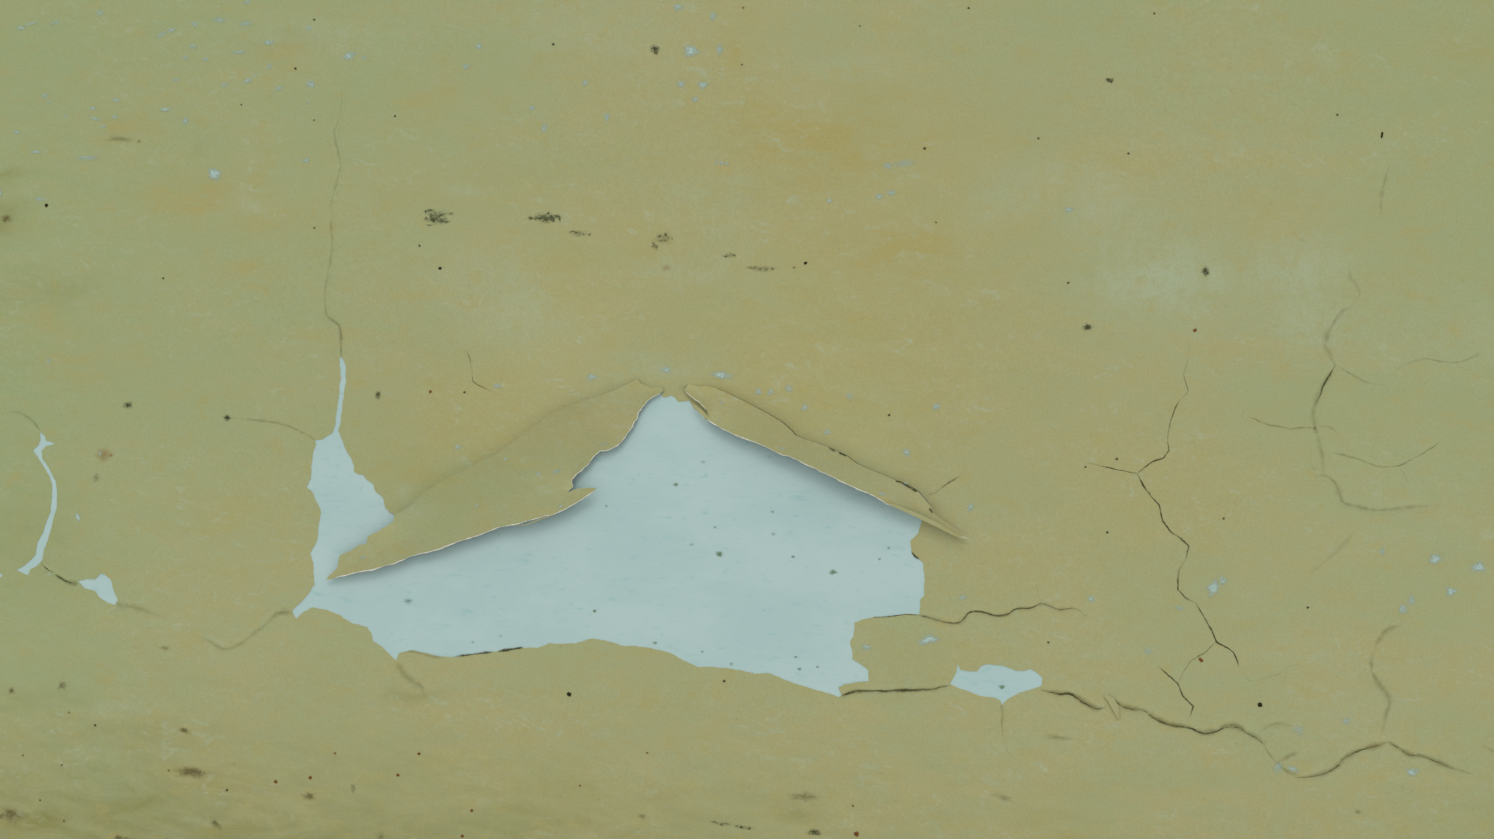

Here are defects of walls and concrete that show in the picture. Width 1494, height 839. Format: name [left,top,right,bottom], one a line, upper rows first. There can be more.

peeling [0,432,57,577]
peeling [78,574,118,605]
peeling [292,357,968,697]
crack [919,595,1091,625]
crack [1106,405,1238,663]
crack [839,677,950,699]
peeling [950,664,1042,705]
crack [1040,670,1476,781]